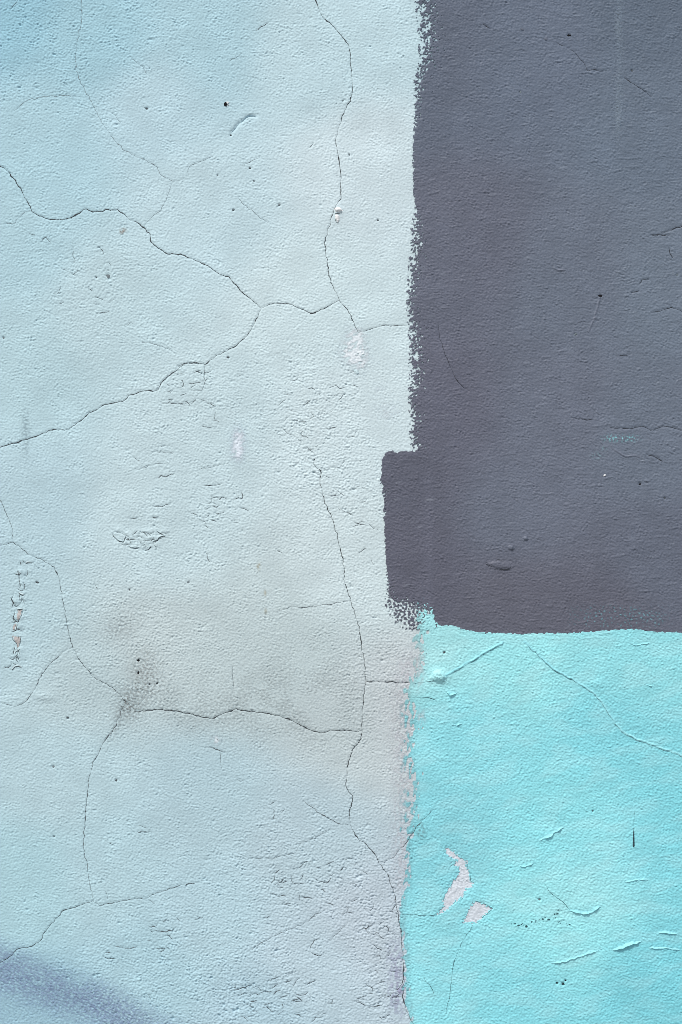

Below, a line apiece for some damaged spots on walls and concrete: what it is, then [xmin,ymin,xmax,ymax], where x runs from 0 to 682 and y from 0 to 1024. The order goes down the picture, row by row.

crack [0,0,398,447]
peeling [5,561,39,670]
crack [0,385,682,1021]
peeling [433,848,493,924]